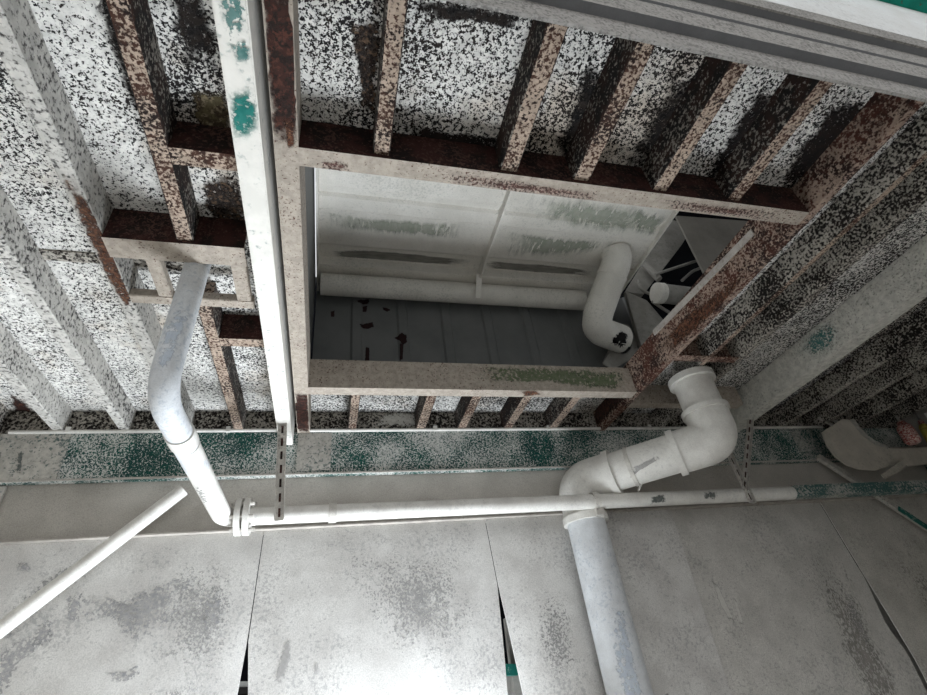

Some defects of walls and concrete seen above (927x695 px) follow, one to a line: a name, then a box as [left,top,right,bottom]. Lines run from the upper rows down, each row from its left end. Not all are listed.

corrosion [264,0,296,147]
corrosion [666,200,778,219]
corrosion [663,275,745,351]
corrosion [594,398,623,424]